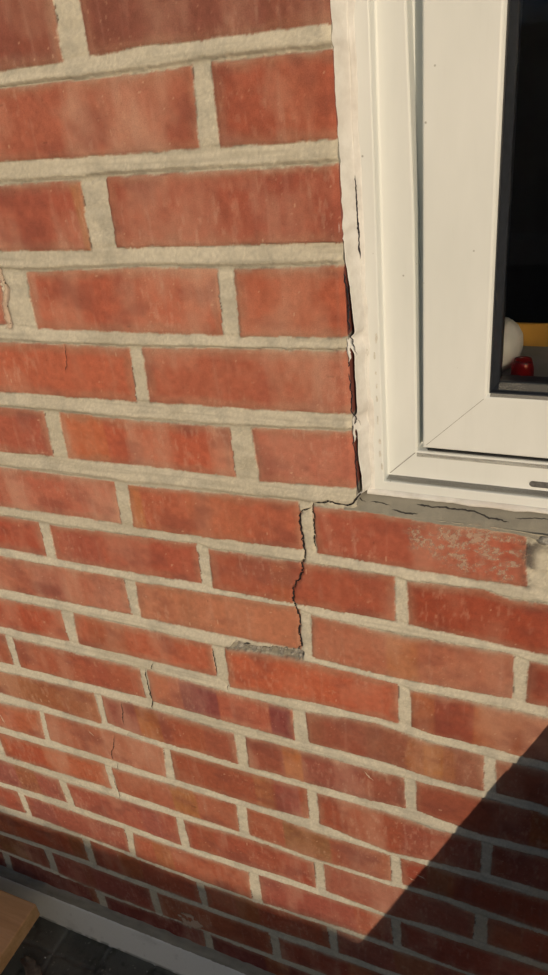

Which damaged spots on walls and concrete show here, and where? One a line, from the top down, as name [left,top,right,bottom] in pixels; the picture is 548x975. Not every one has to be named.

crack [292,491,548,647]